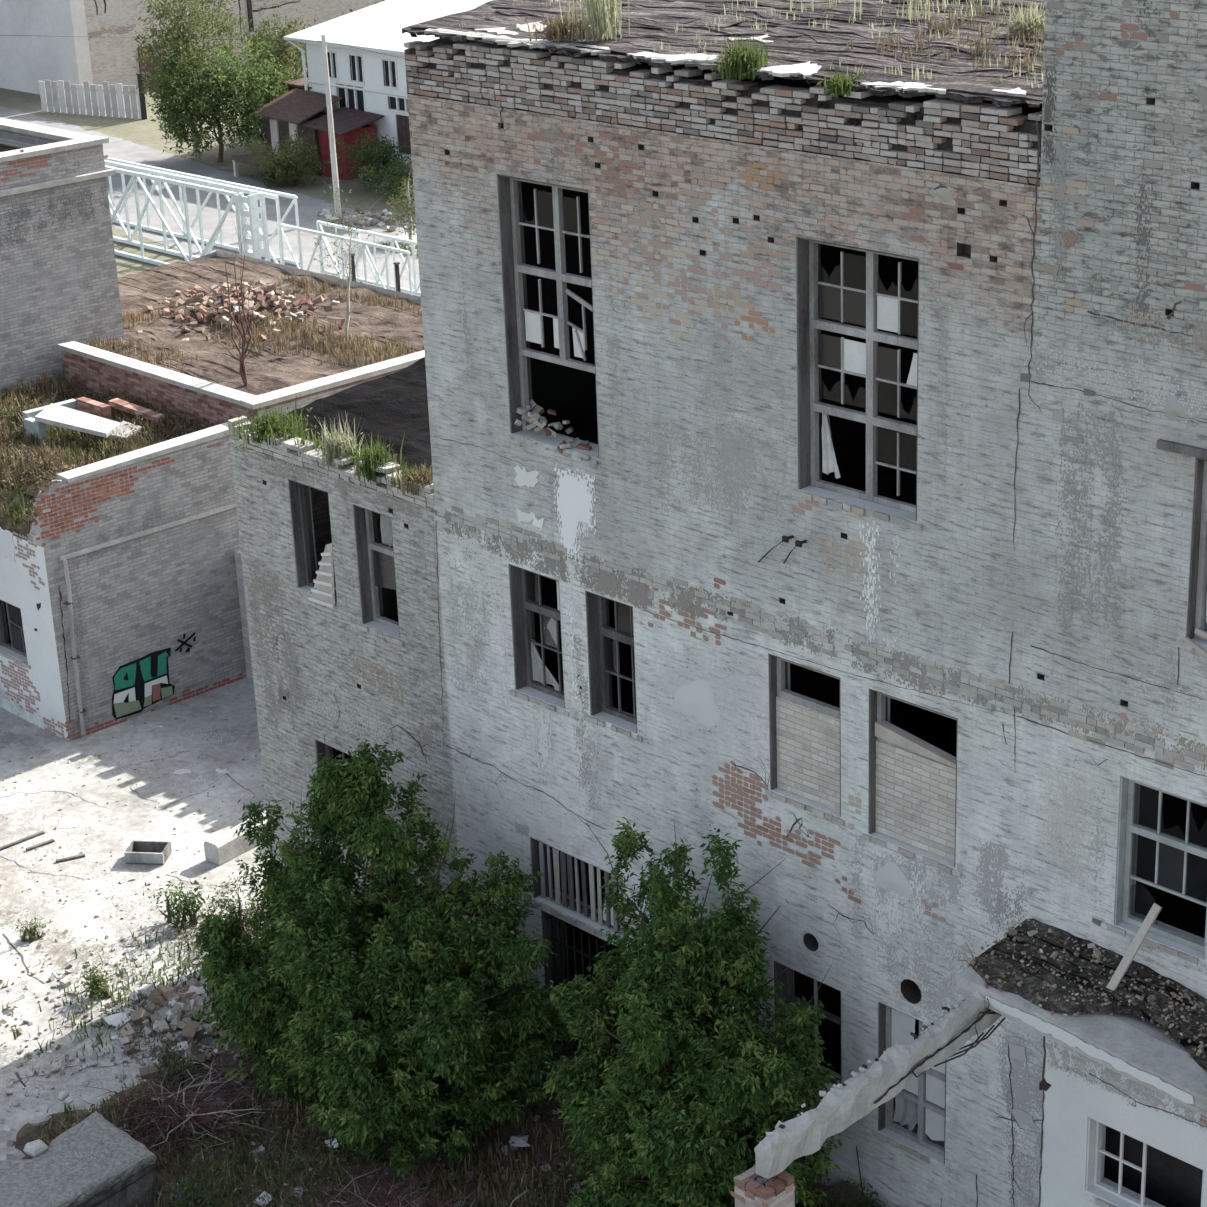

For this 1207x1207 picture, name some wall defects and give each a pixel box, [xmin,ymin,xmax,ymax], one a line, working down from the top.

crack [1007,114,1206,551]
spalling [0,457,175,610]
spalling [0,660,128,741]
crack [391,510,605,829]
spalling [645,578,733,645]
spalling [712,761,841,868]
crack [874,998,1001,1104]
crack [997,1036,1046,1207]